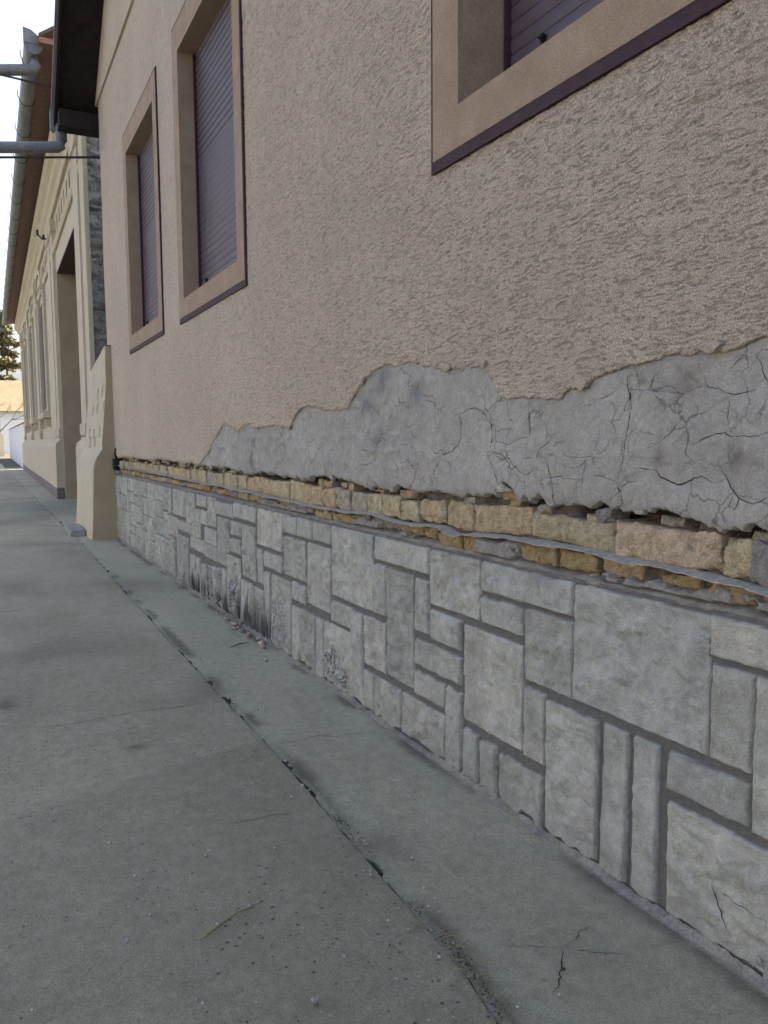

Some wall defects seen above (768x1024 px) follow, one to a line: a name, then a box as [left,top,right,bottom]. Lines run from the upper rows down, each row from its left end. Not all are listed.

flaking render [117,336,768,617]
crack [432,354,768,510]
crack [505,925,619,994]
crack [712,887,768,937]